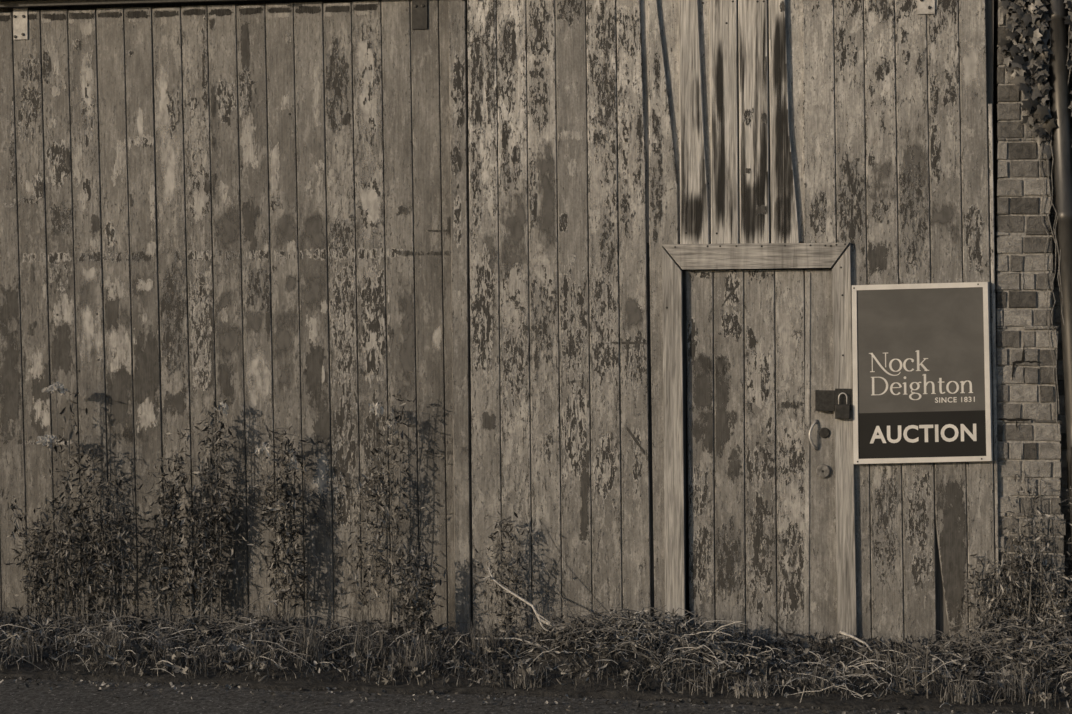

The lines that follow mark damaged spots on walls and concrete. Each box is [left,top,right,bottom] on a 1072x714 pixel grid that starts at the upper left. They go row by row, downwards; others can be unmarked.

peeling [6,49,52,190]
peeling [30,258,72,293]
peeling [32,139,72,235]
peeling [82,175,91,205]
peeling [160,255,213,391]
peeling [166,12,256,228]
peeling [244,252,277,312]
peeling [397,0,673,508]
peeling [806,0,958,284]
peeling [964,203,988,275]
peeling [687,270,812,624]